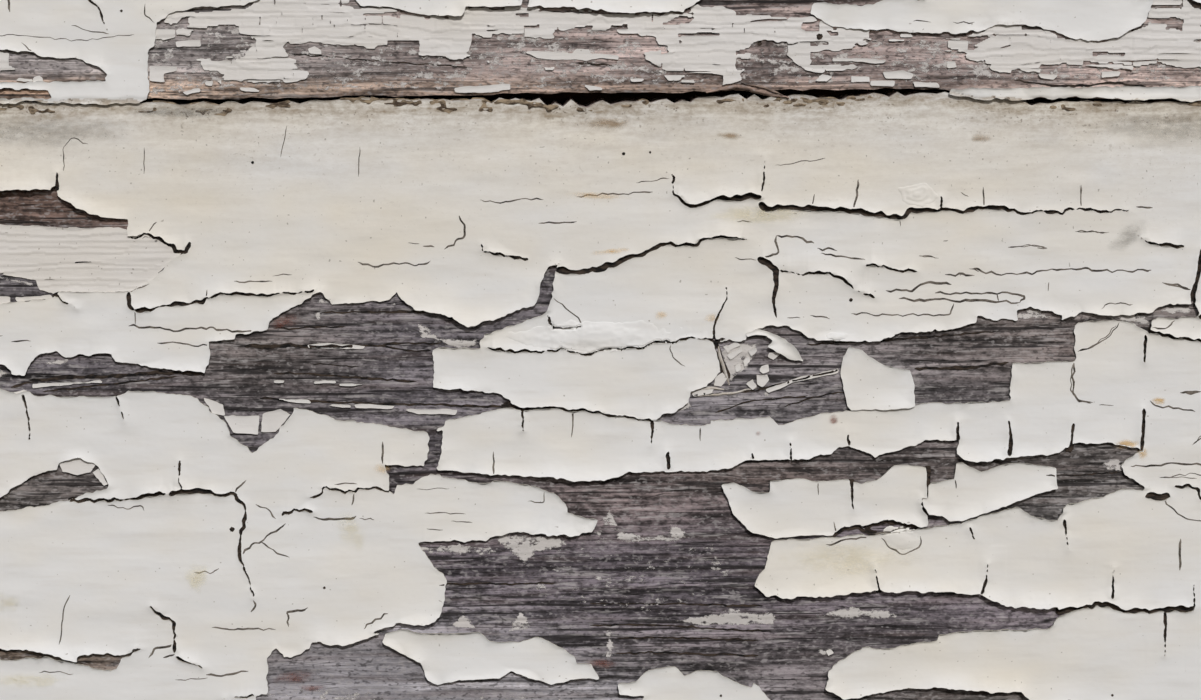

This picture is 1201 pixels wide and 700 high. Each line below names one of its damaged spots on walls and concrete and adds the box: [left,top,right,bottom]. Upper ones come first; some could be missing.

peeling [0,49,107,100]
peeling [147,0,1201,100]
peeling [0,186,181,304]
crack [130,222,191,254]
crack [11,274,670,469]
crack [358,158,1201,647]
peeling [0,265,1198,700]
crack [68,442,391,631]
crack [39,596,72,675]
crack [149,606,253,698]
crack [590,602,772,657]